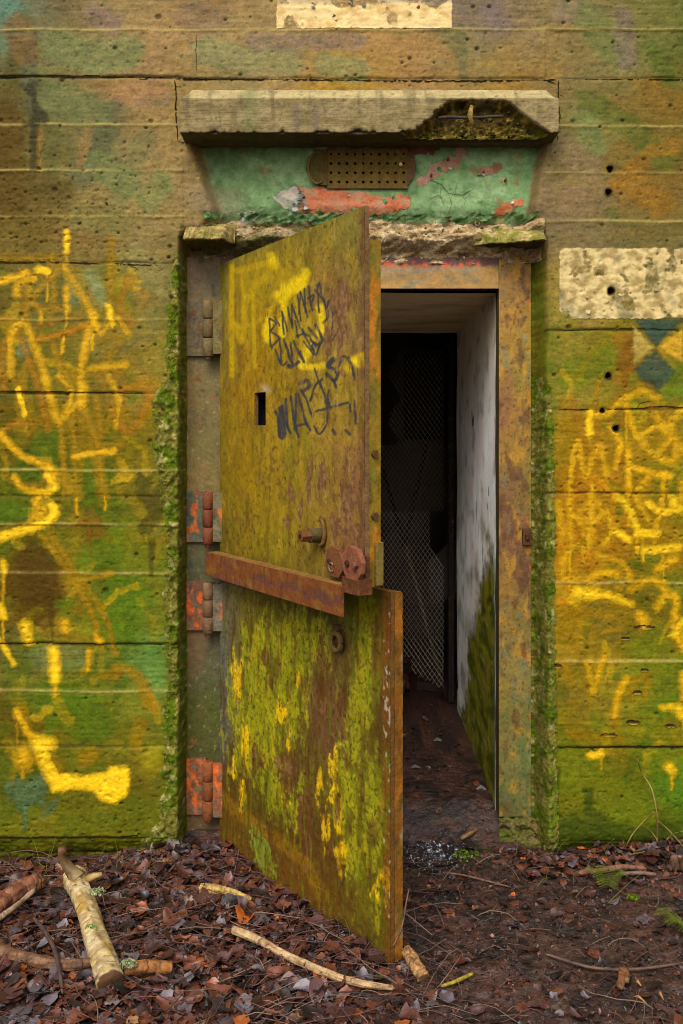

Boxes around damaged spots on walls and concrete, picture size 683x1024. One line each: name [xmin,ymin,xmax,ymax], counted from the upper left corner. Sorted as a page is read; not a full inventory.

spalling [392,99,548,187]
spalling [199,186,545,264]